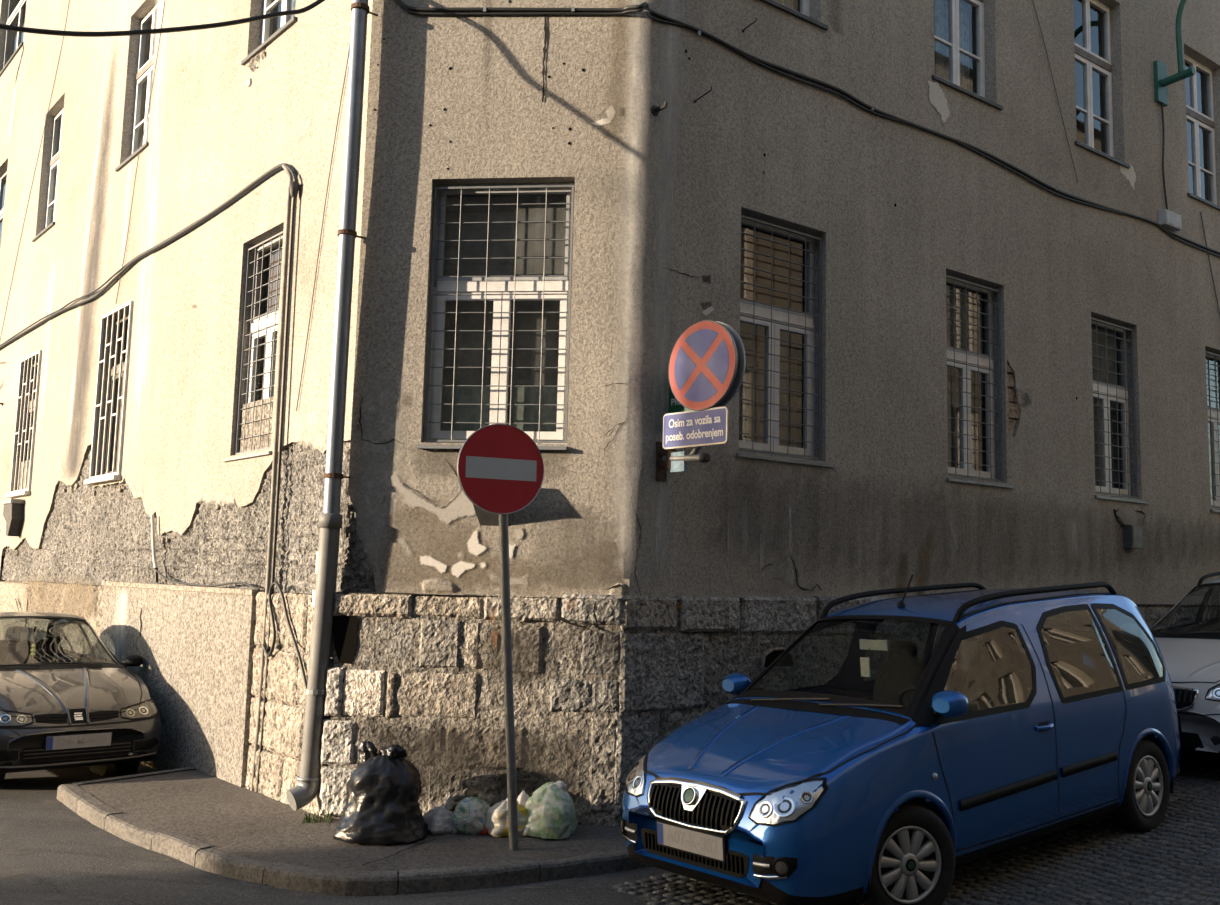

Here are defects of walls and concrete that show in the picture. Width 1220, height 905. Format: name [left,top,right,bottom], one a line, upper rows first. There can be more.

crack [540,16,548,102]
leakage [69,104,109,472]
flaking render [0,396,326,594]
flaking render [336,440,398,594]
flaking render [388,474,475,524]
flaking render [399,528,527,585]